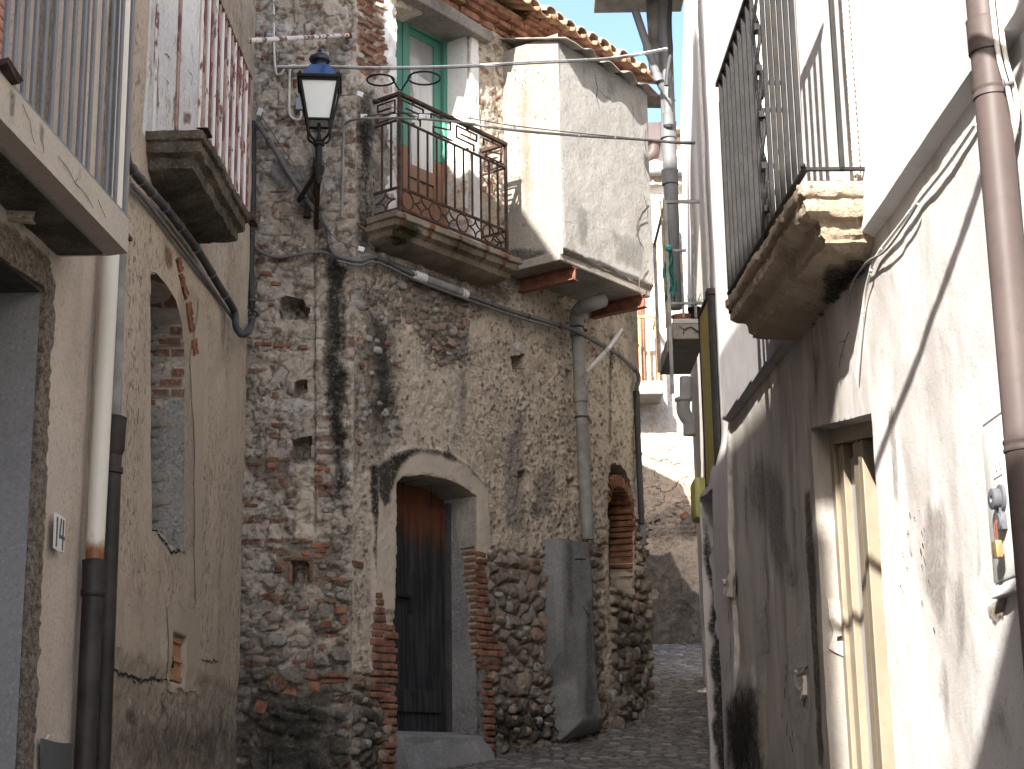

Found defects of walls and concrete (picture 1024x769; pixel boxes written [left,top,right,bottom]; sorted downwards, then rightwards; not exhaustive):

crack [22,104,106,217]
spalling [175,257,199,356]
mould [812,260,871,325]
water stain [323,259,347,501]
mould [370,448,456,558]
crack [114,668,170,684]
water stain [703,527,756,769]